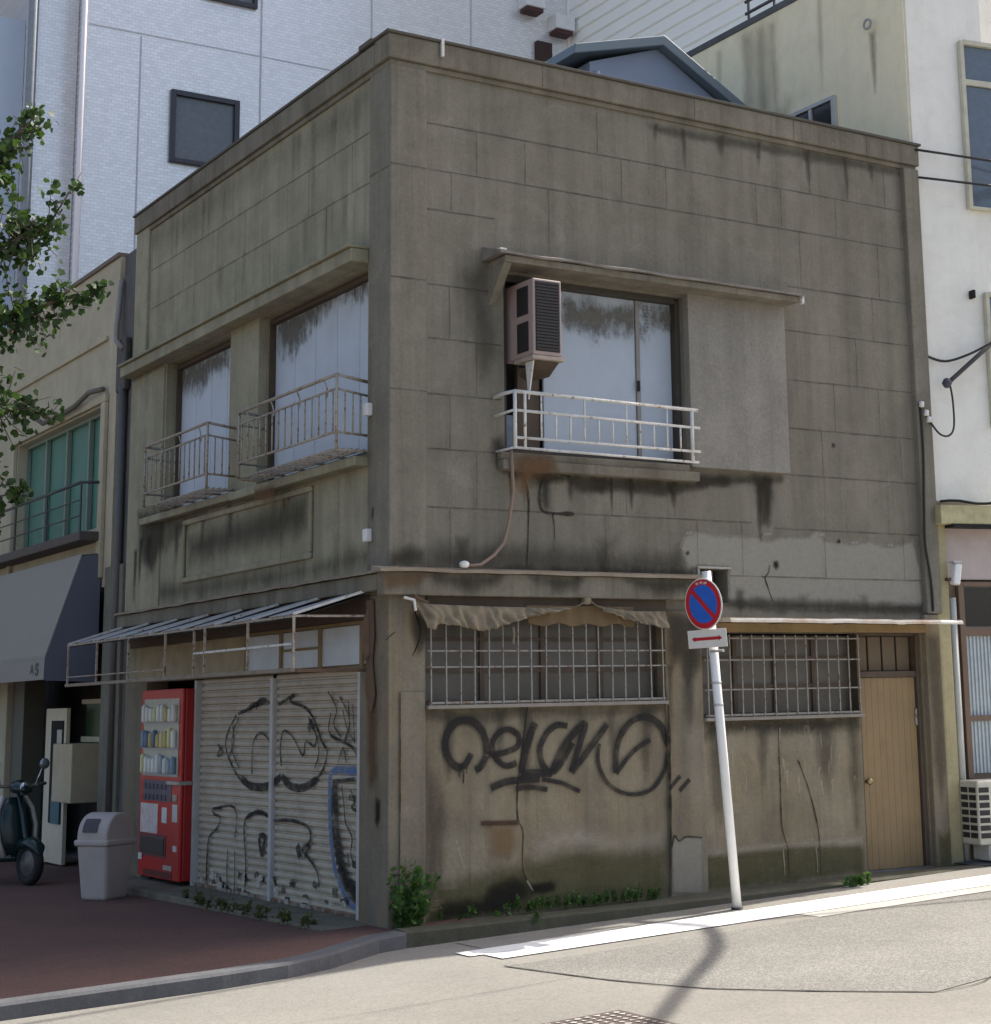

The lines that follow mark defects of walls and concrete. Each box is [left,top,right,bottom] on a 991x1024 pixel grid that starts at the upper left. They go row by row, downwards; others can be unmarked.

damp [514,474,771,522]
damp [134,511,164,582]
crack [778,727,821,875]
damp [438,879,555,918]